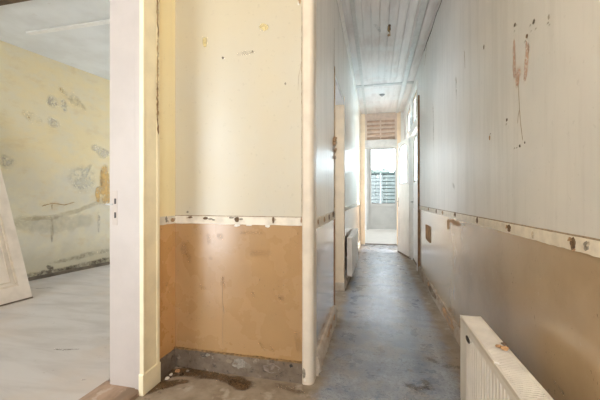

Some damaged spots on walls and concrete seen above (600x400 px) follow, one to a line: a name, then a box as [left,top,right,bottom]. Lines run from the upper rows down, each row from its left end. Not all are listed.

crack [154,0,162,134]
spalling [567,237,590,251]